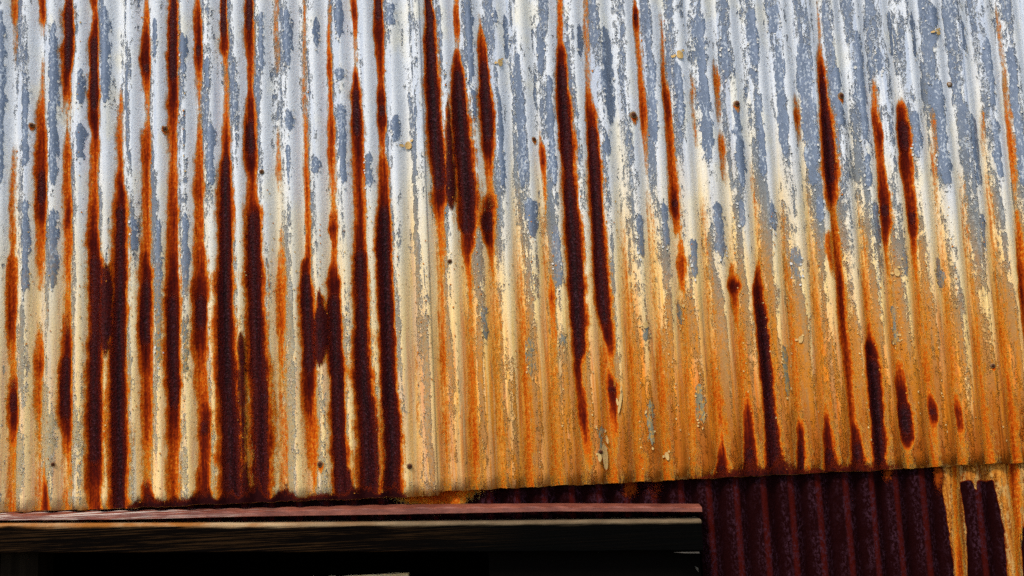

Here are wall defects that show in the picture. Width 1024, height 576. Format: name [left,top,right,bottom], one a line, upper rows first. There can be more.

peeling [0,10,8,182]
peeling [47,21,61,189]
rust [4,0,510,512]
peeling [491,7,540,241]
rust [517,256,537,487]
rust [532,0,675,500]
peeling [599,26,616,159]
peeling [671,13,731,166]
peeling [710,3,828,399]
rust [660,8,1024,576]
peeling [826,11,912,349]
peeling [967,36,1024,191]